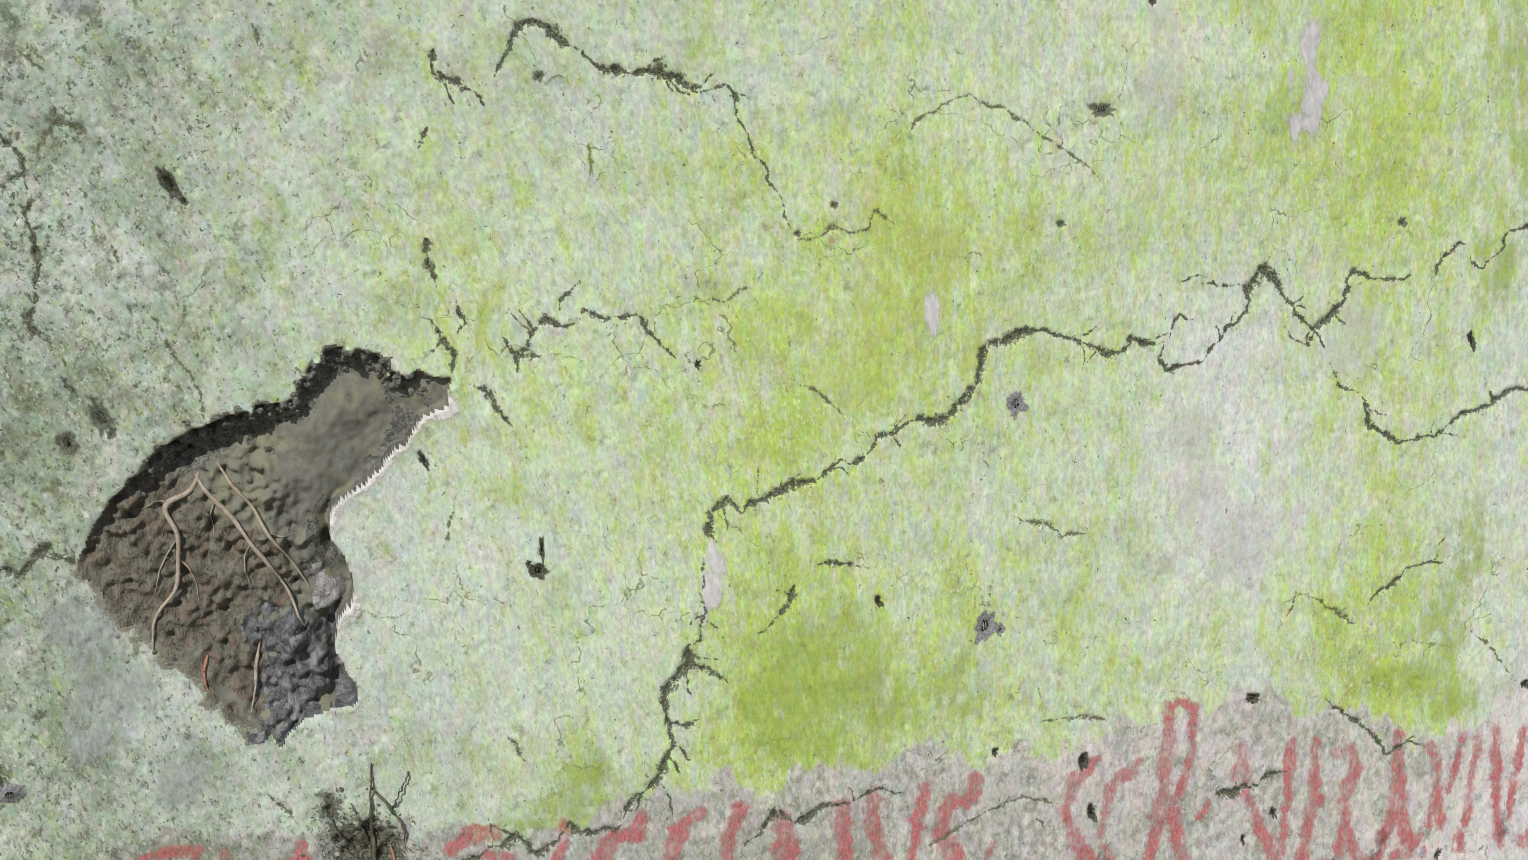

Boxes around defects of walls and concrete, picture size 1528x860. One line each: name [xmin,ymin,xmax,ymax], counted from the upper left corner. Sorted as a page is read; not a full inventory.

crack [422,237,675,427]
crack [417,17,894,240]
spalling [47,344,460,763]
crack [463,224,1528,860]